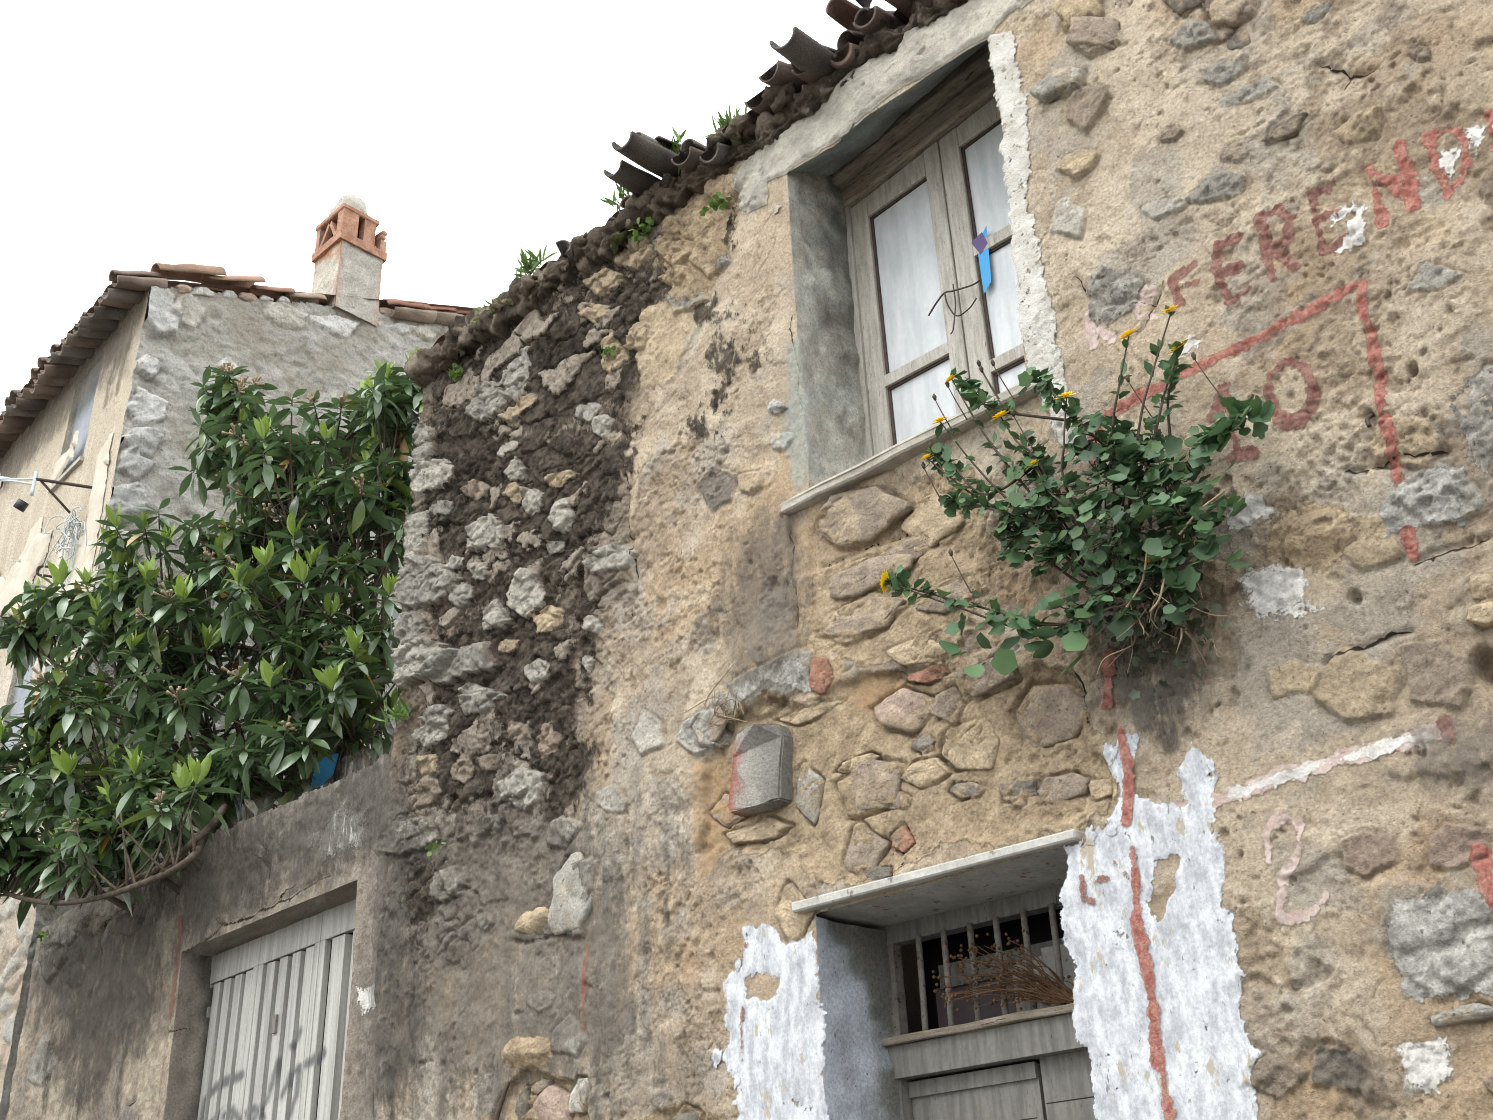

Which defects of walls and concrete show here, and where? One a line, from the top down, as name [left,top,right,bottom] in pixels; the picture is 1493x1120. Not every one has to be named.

damp [1103,632,1209,750]
crack [1328,631,1412,663]
spalling [692,467,1265,1120]
damp [33,754,629,1120]
flaking render [514,851,593,935]
peeling [641,891,830,1120]
spalling [484,1067,591,1120]